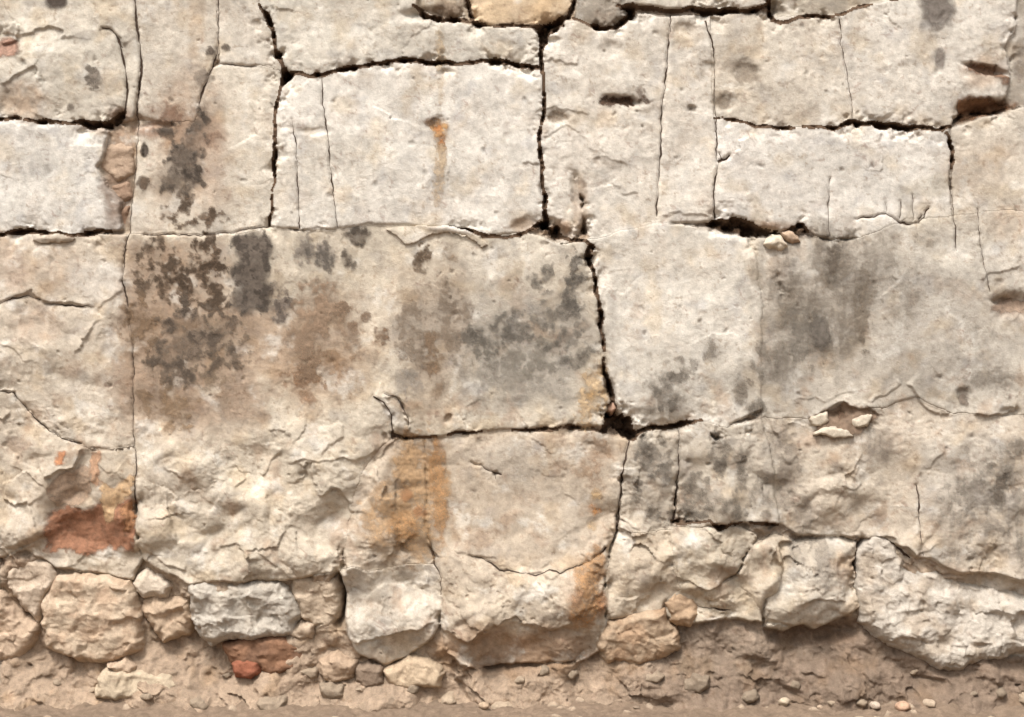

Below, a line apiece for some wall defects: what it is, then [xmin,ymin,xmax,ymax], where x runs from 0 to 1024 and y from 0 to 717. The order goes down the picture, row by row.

crack [322,83,338,227]
corrosion [424,118,448,200]
damp [599,95,650,107]
crack [655,16,671,217]
crack [705,21,730,223]
damp [119,106,594,432]
crack [858,179,990,290]
crack [0,391,82,444]
spalling [808,402,879,440]
spalling [43,451,137,556]
crack [472,437,630,576]